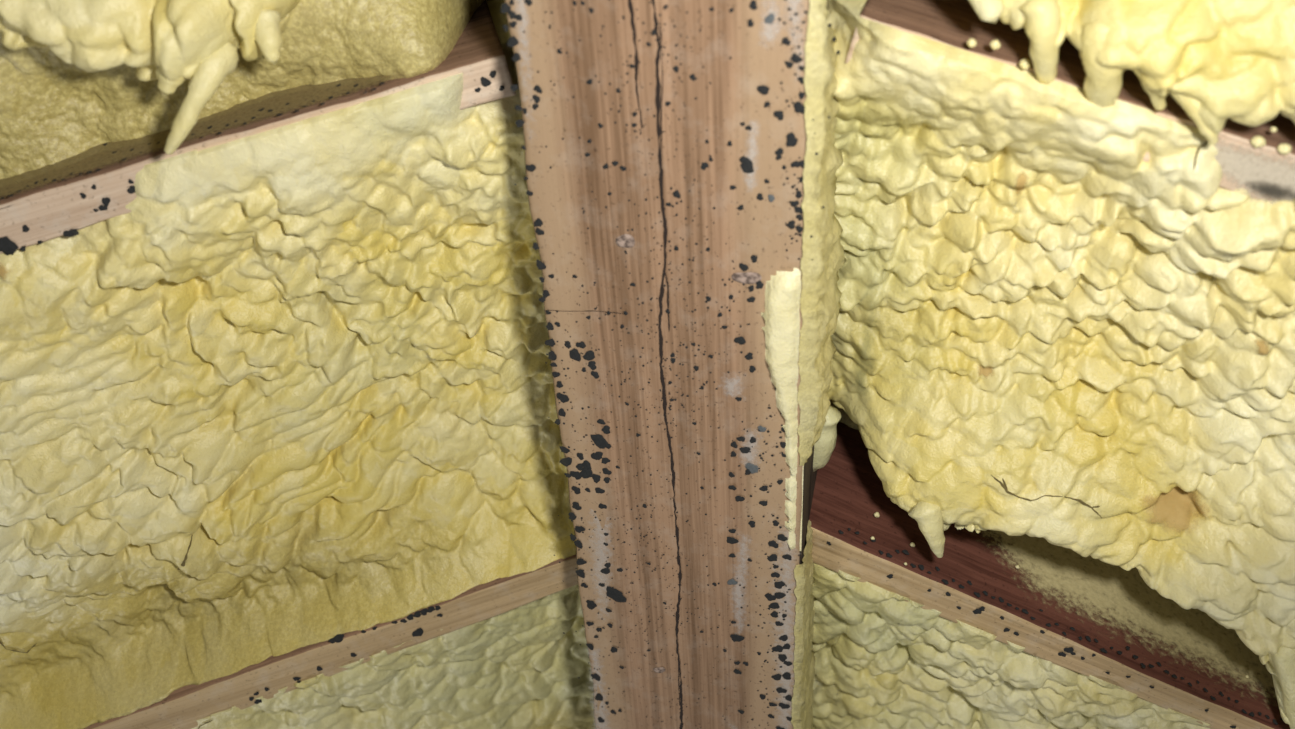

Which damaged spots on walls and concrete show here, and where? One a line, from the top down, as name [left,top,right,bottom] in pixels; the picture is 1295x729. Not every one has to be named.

leakage [501,0,569,62]
leakage [572,1,711,84]
leakage [475,70,565,128]
leakage [709,0,831,260]
leakage [0,169,110,212]
leakage [0,225,43,278]
crack [628,0,683,729]
leakage [533,55,800,729]
leakage [1147,486,1204,531]
leakage [329,634,357,657]
leakage [392,605,443,637]
leakage [826,528,1284,729]